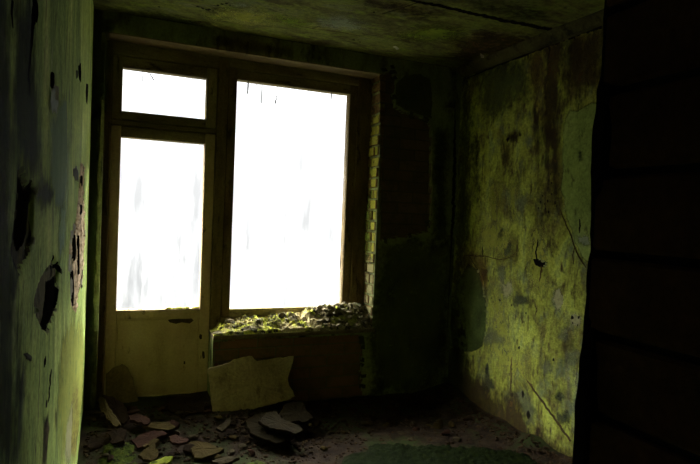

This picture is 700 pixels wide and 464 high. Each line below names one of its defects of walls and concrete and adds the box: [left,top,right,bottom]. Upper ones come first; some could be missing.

water stain [534,25,603,195]
spalling [12,165,54,276]
flaking render [34,163,86,335]
water stain [448,76,573,457]
spalling [533,239,547,282]
crack [559,208,587,268]
crack [510,358,571,442]